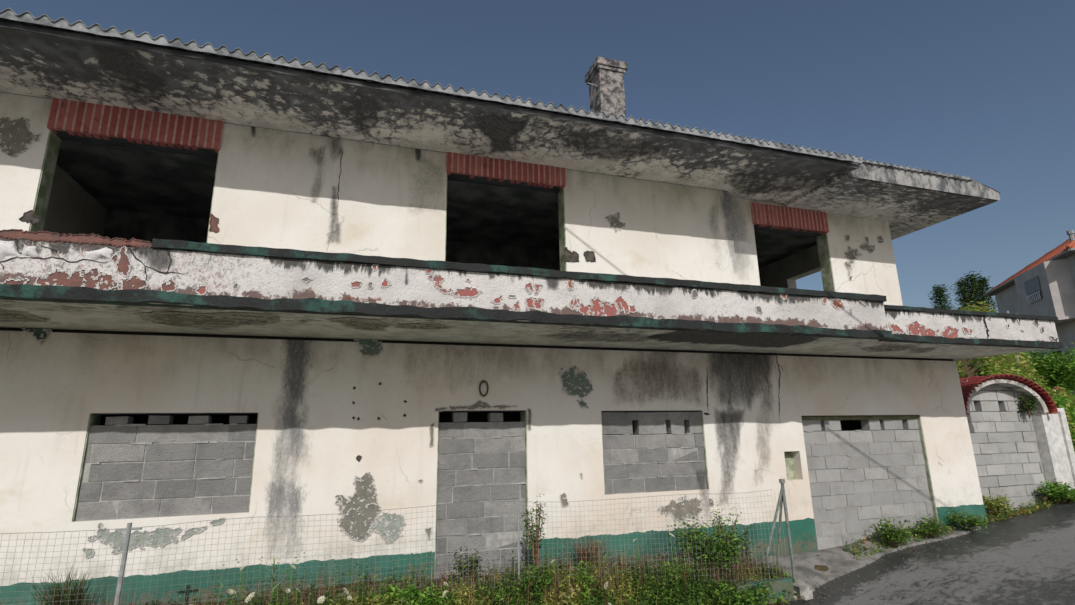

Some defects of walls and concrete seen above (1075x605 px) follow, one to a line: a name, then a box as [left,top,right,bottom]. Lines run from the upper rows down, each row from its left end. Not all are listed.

water stain [477,115,523,152]
water stain [564,129,667,160]
water stain [722,169,846,248]
peeling [0,246,178,292]
water stain [137,247,171,269]
peeling [425,269,545,311]
spalling [562,247,596,263]
peeling [566,278,637,316]
water stain [542,329,823,483]
water stain [270,340,309,526]
peeling [335,471,406,544]
peeling [82,517,226,559]